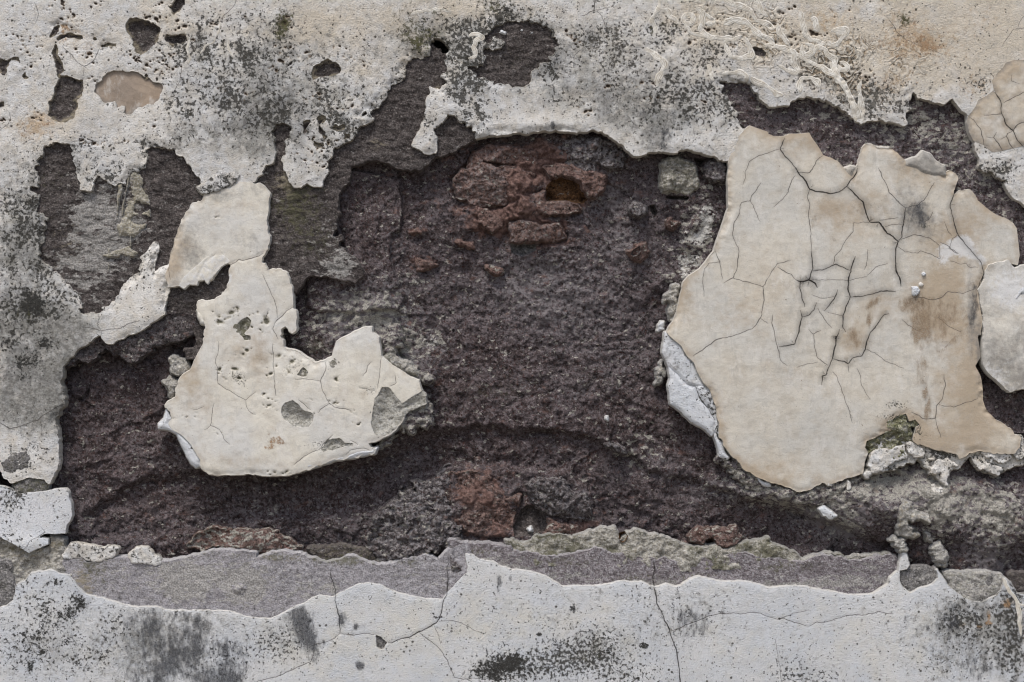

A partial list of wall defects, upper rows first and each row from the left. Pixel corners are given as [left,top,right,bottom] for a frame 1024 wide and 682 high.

spalling [48,25,116,123]
flaking render [468,21,559,88]
flaking render [256,43,477,294]
crack [195,256,291,443]
spalling [0,132,1024,618]
crack [696,138,984,421]
flaking render [660,60,1024,493]
crack [912,380,976,436]
leakage [470,642,541,682]
crack [652,565,891,682]